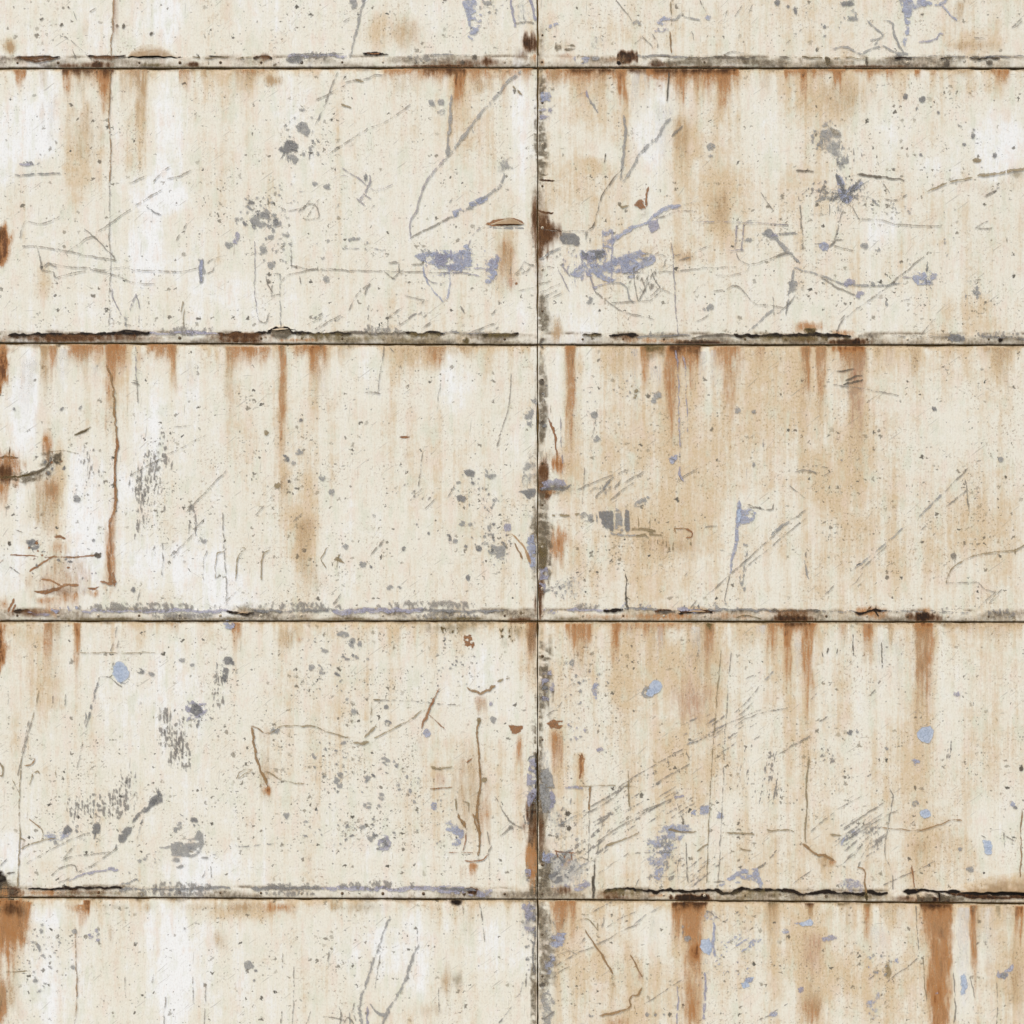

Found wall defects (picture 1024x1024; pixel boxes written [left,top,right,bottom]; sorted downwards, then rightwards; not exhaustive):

rust [486,204,562,259]
rust [640,339,736,422]
rust [0,436,66,519]
rust [509,366,575,1024]
rust [769,611,816,707]
rust [0,871,102,1021]
rust [669,894,710,971]
rust [900,897,956,1024]
rust [687,987,698,1019]